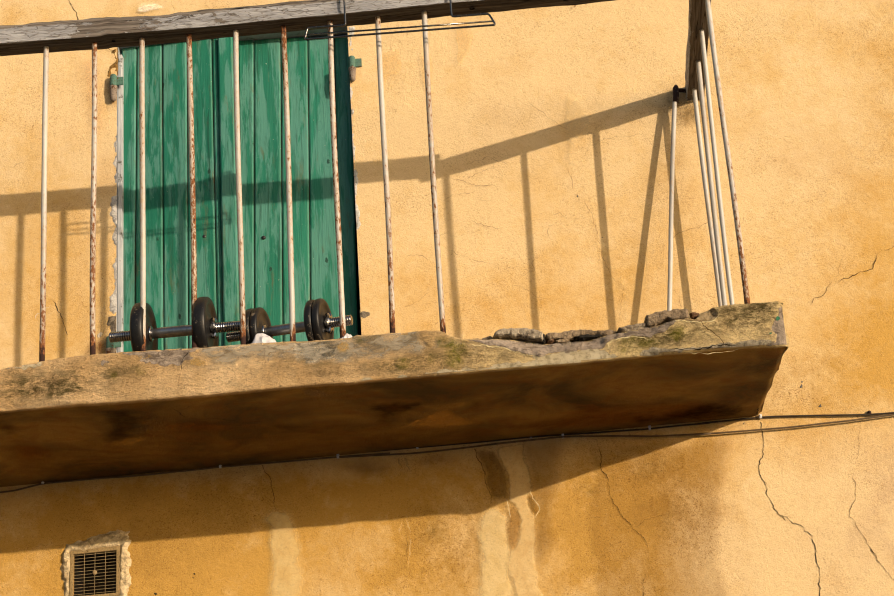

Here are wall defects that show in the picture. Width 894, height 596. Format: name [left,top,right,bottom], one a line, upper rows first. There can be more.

spalling [418,307,787,377]
damp [499,445,543,596]
crack [599,450,664,553]
crack [755,408,821,596]